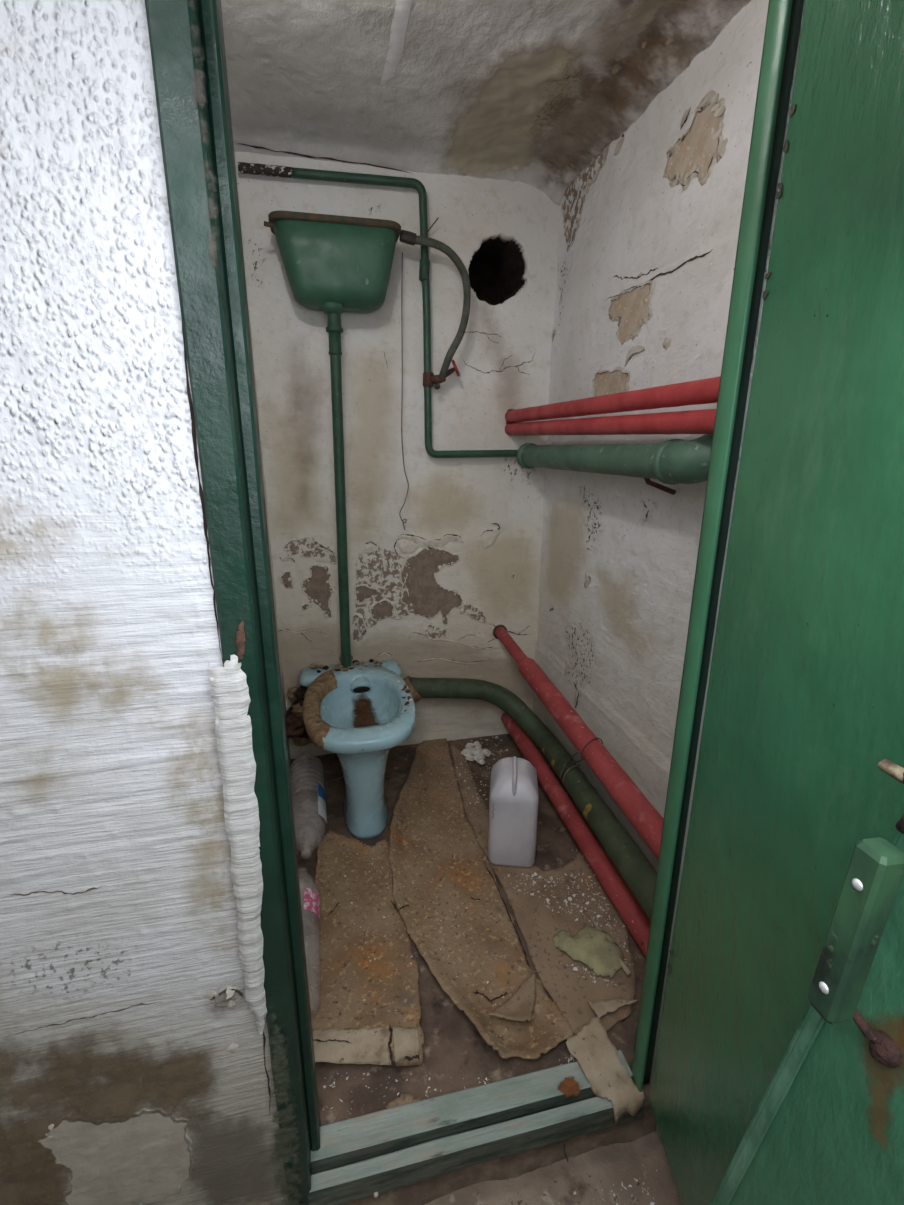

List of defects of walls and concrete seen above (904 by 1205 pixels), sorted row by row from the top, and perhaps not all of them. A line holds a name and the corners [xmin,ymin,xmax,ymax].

damp [447,0,699,175]
peeling [663,93,726,192]
peeling [561,144,610,251]
peeling [608,280,654,345]
crack [609,249,713,298]
peeling [592,367,630,397]
peeling [277,537,337,620]
peeling [351,546,491,645]
damp [0,1046,278,1205]